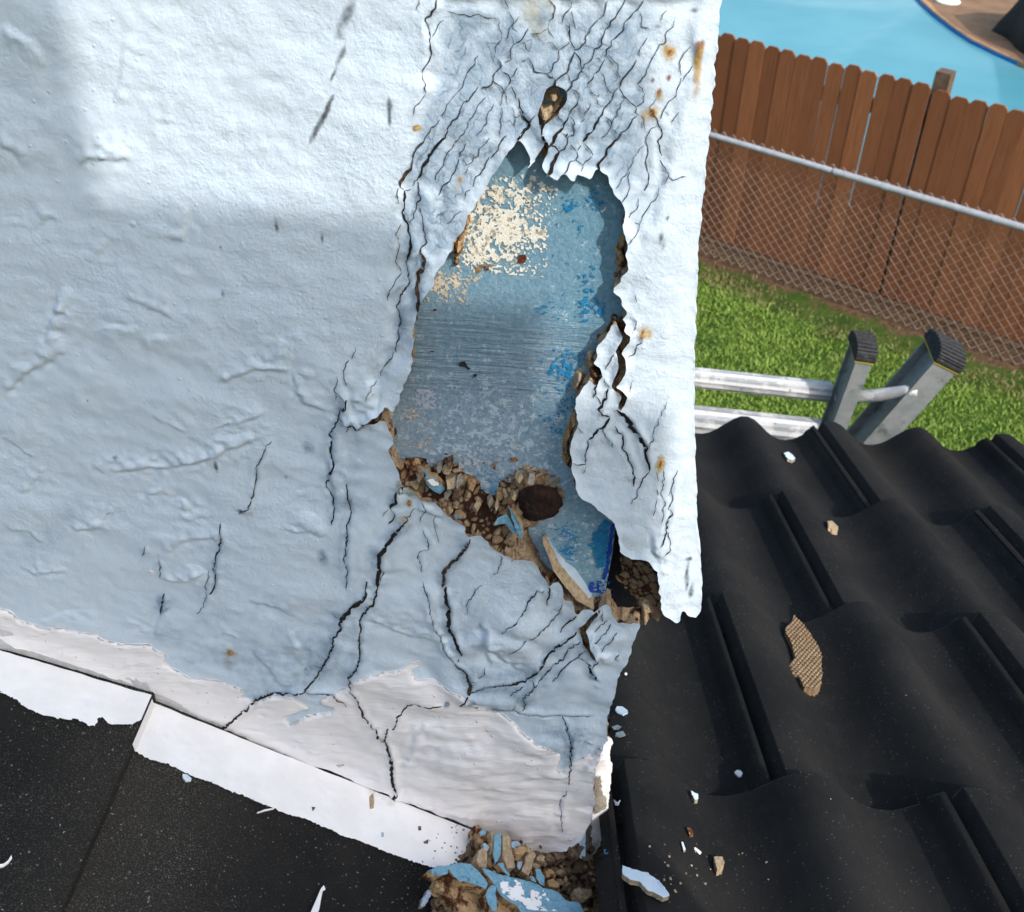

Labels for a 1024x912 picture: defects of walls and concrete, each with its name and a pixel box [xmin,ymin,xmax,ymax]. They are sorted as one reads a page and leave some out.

corrosion [694,41,704,79]
peeling [424,170,610,305]
spalling [614,233,627,278]
peeling [530,262,619,326]
crack [222,0,692,832]
spalling [539,349,601,482]
crack [197,441,272,614]
spalling [385,389,615,609]
spalling [639,597,654,625]
peeling [421,863,497,912]
peeling [478,829,545,887]